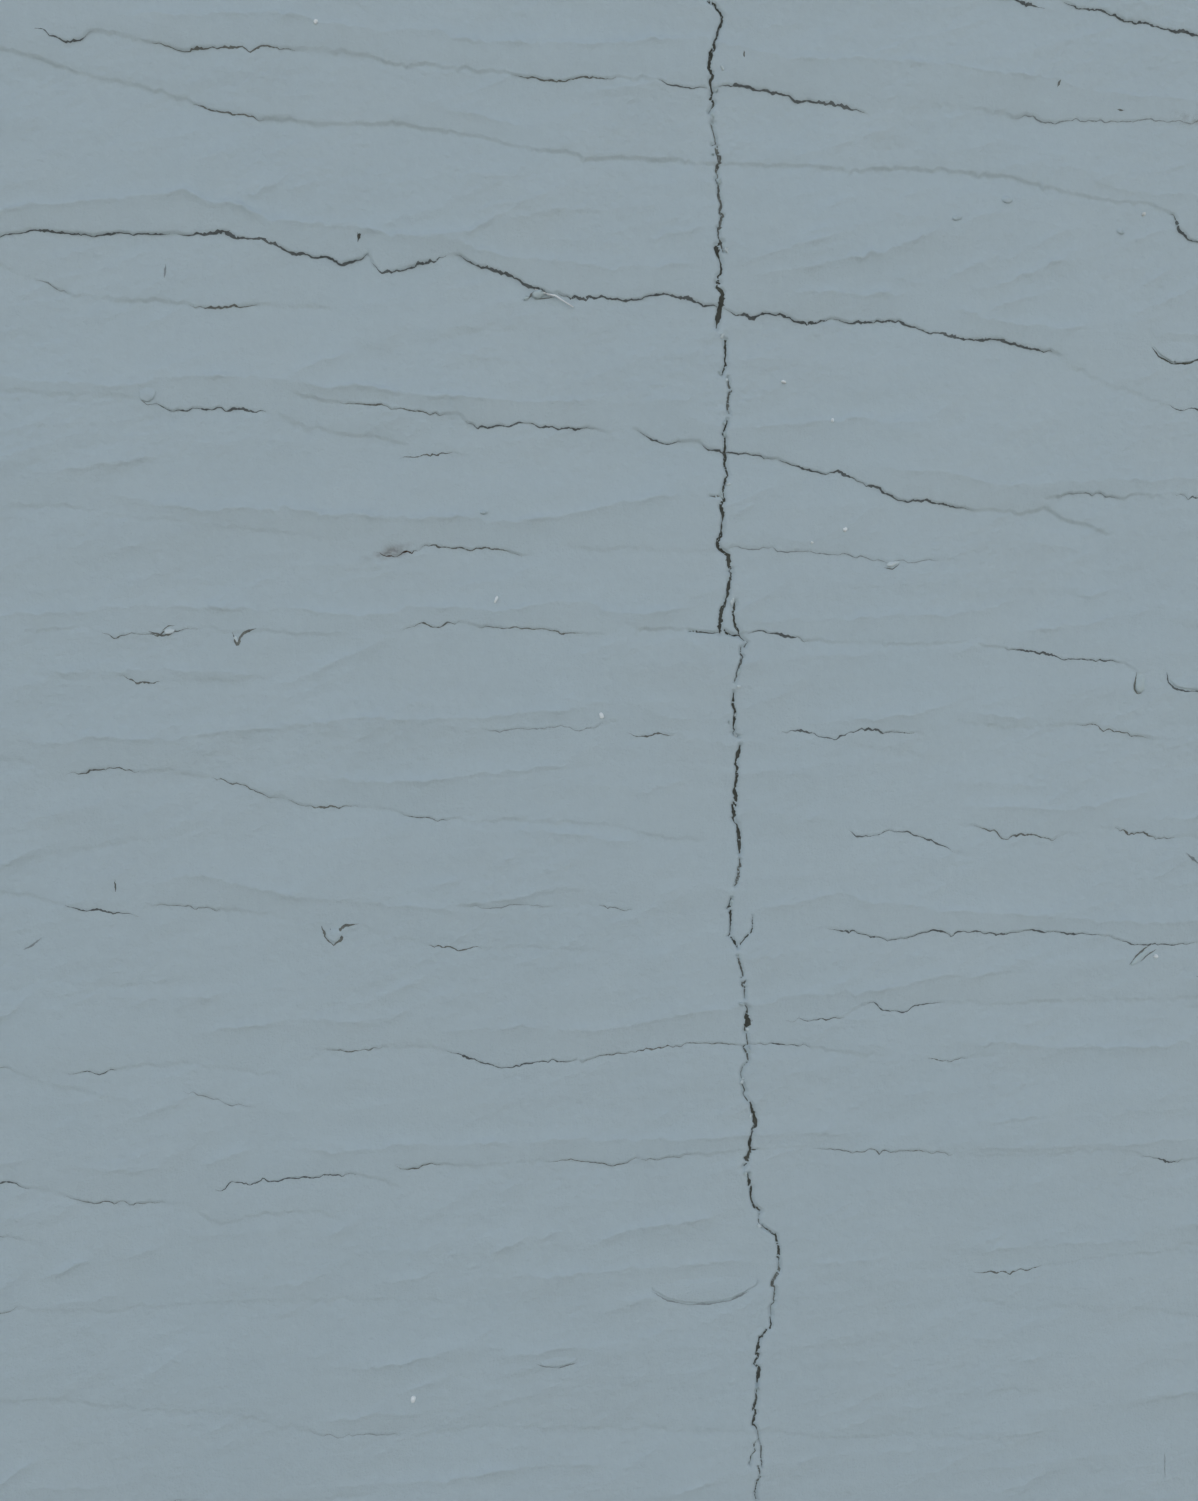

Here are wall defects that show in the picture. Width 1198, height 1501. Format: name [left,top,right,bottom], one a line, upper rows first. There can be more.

crack [154,43,295,53]
crack [1172,214,1198,242]
crack [1,229,443,274]
crack [196,302,254,310]
peeling [1153,341,1198,365]
crack [155,403,263,413]
crack [343,403,590,458]
crack [381,544,518,557]
crack [445,1,1053,1498]
crack [321,924,355,946]
crack [833,929,1194,965]
crack [217,1173,356,1191]